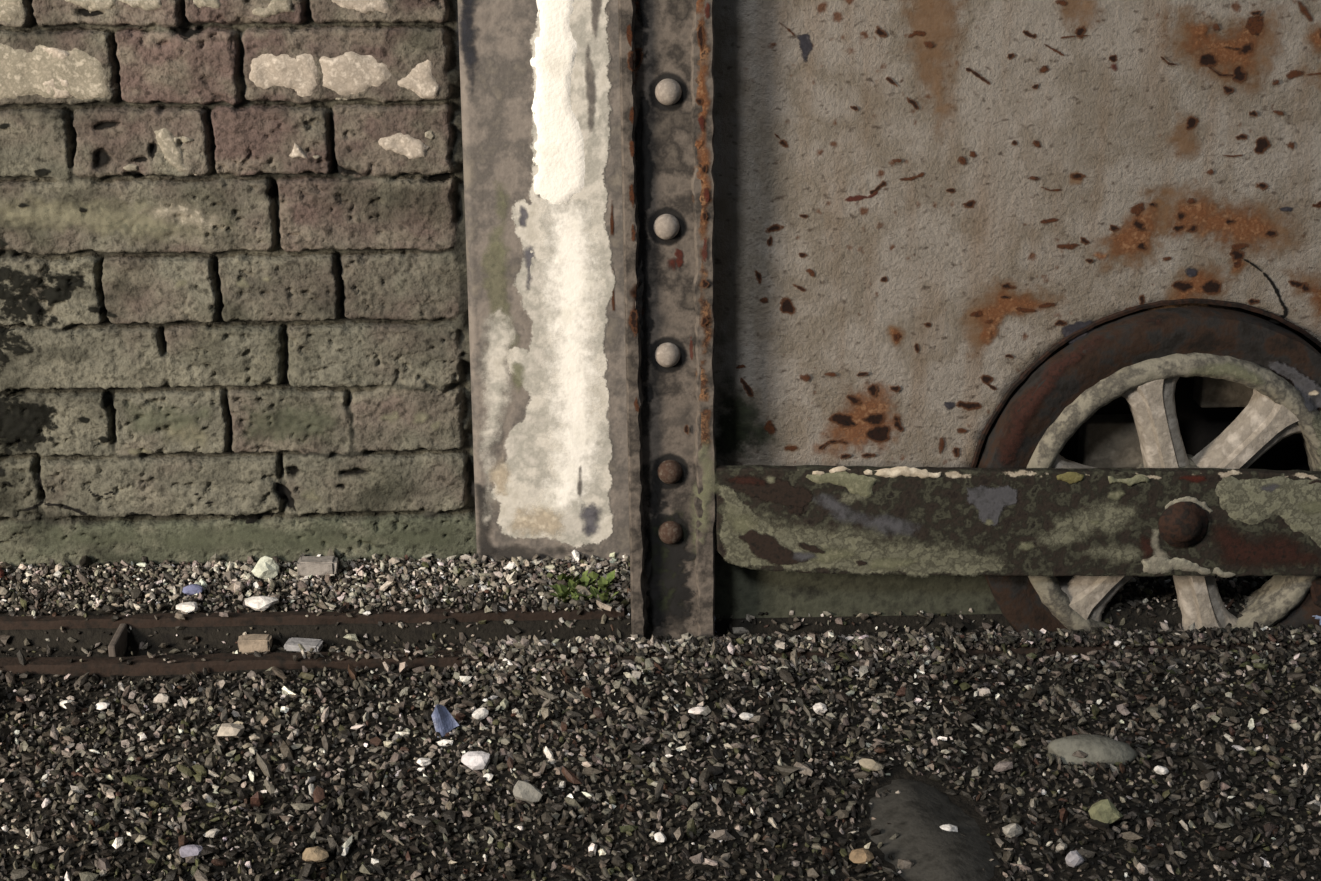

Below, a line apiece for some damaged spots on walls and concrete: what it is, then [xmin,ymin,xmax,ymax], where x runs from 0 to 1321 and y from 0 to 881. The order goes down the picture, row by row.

damp [457,0,477,82]
corrosion [1161,10,1321,95]
corrosion [1223,134,1270,157]
corrosion [1057,189,1292,306]
damp [0,237,84,368]
damp [0,391,58,487]
corrosion [818,372,904,460]
corrosion [944,400,981,411]
damp [473,484,565,561]
peeling [718,466,1047,578]
peeling [1141,530,1236,578]
peeling [1165,470,1321,548]